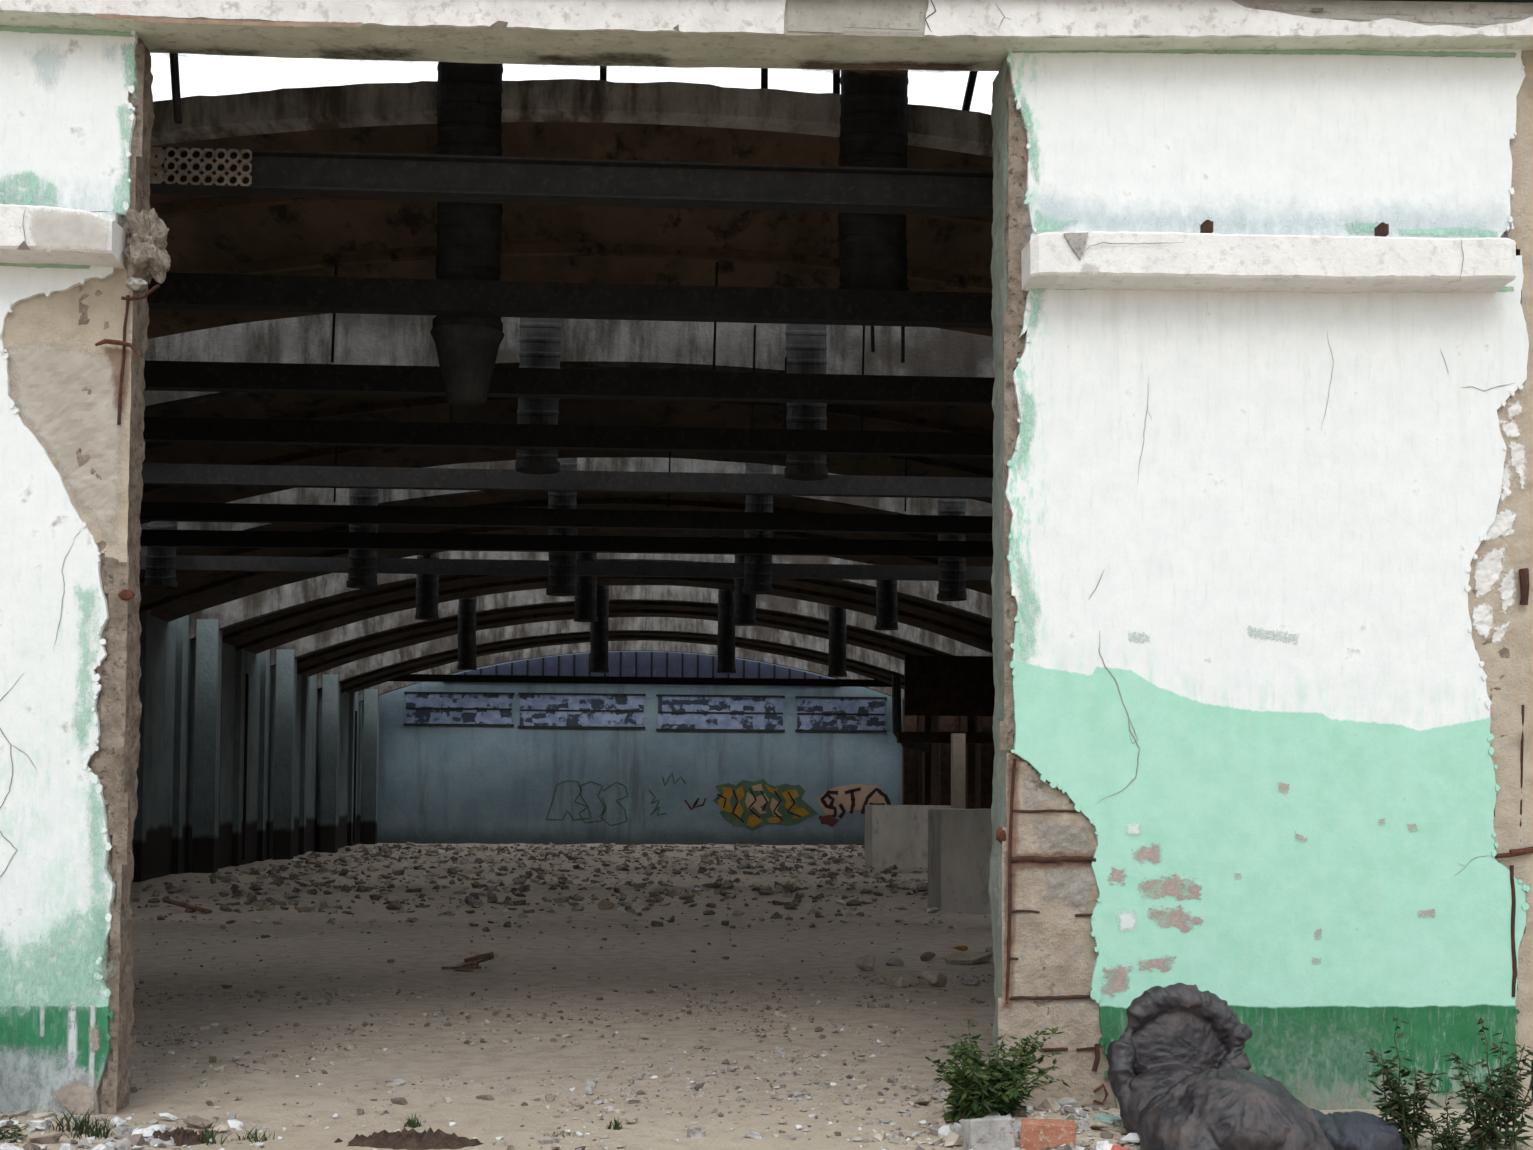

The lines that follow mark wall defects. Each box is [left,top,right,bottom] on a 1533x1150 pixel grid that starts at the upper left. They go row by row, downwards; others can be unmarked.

crack [0,673,37,877]
crack [53,530,81,649]
spalling [0,241,160,1115]
crack [1098,634,1140,803]
spalling [998,49,1533,1108]